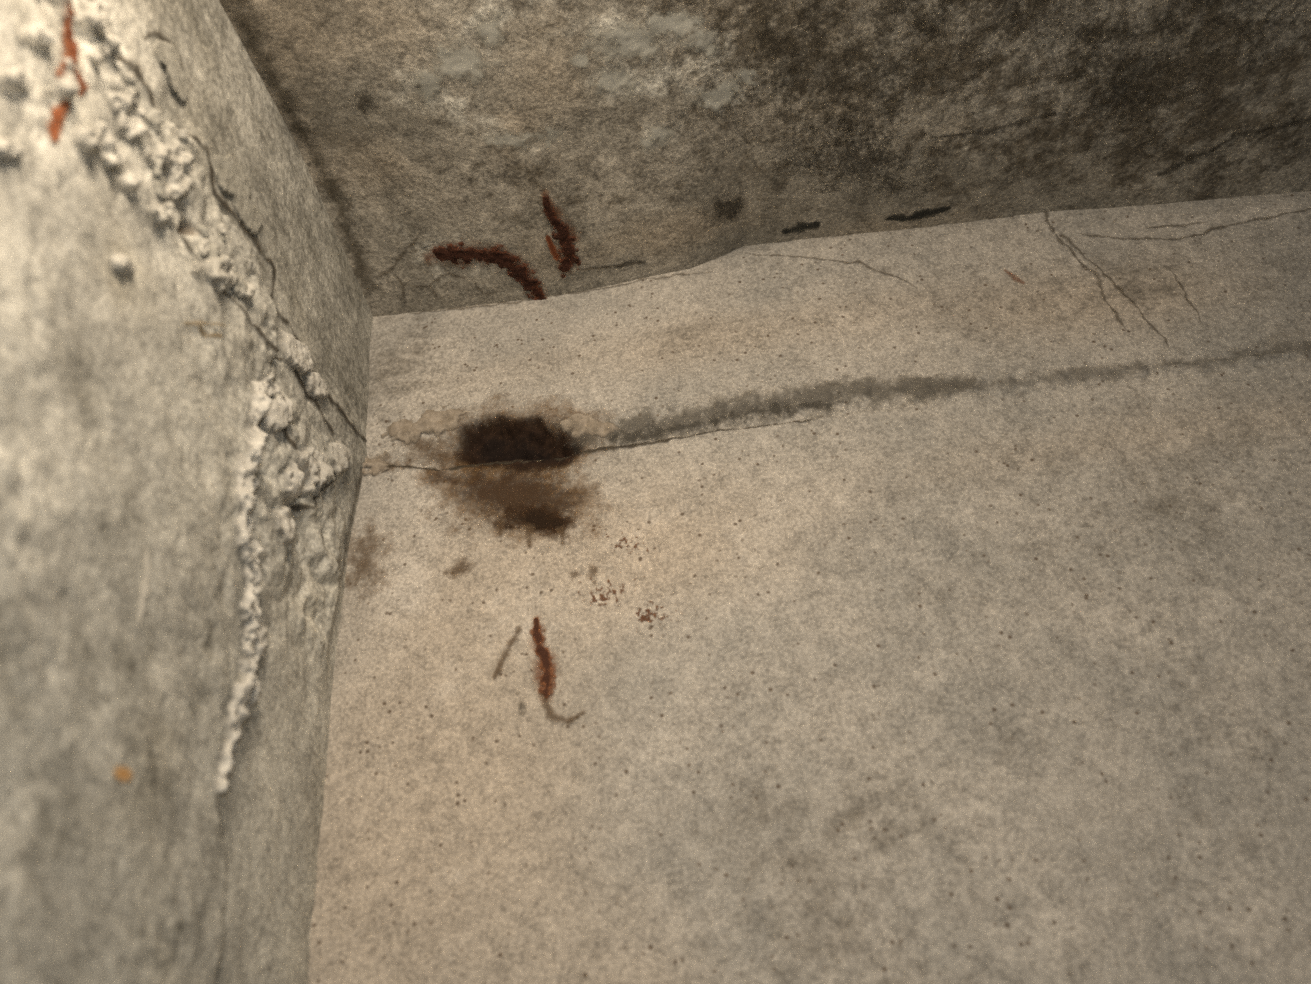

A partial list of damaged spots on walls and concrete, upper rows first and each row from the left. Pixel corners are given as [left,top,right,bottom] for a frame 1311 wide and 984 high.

rust [47,0,89,142]
crack [103,31,183,170]
water stain [570,8,715,101]
water stain [697,68,757,111]
crack [162,204,204,262]
rust [432,242,547,300]
rust [543,196,581,278]
crack [188,134,367,512]
water stain [424,432,588,547]
water stain [486,410,594,459]
crack [387,419,811,470]
rust [493,617,584,723]